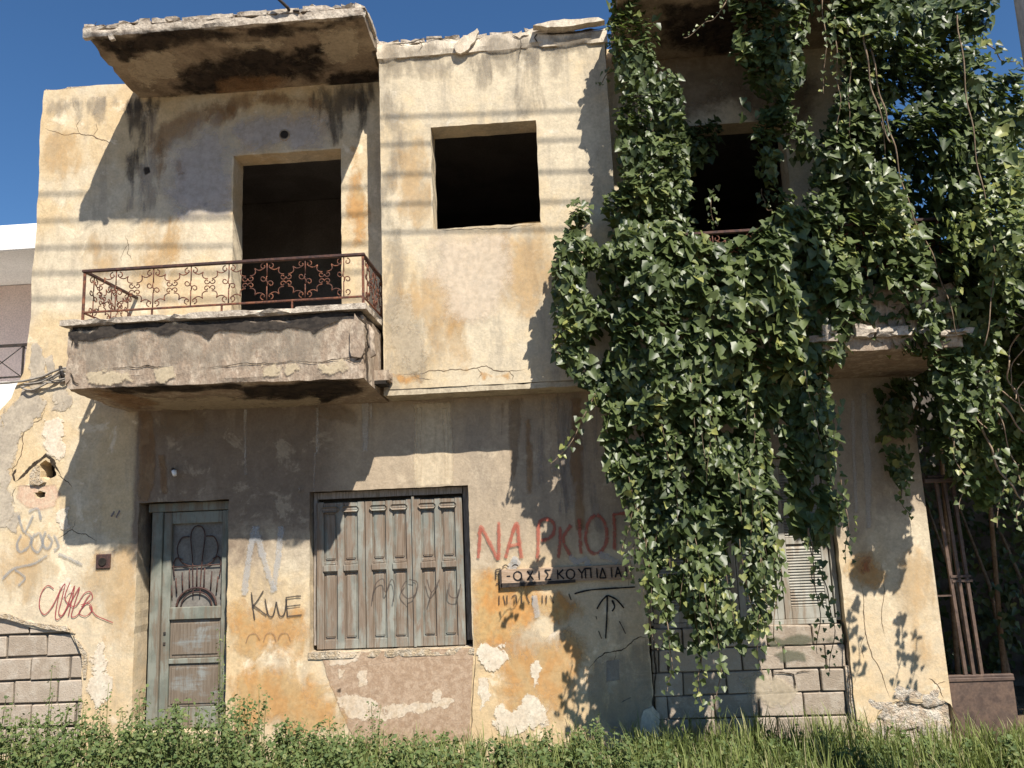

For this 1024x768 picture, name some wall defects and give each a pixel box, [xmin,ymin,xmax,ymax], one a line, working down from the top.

leakage [96,14,379,144]
flaking render [454,29,479,55]
crack [45,120,110,143]
leakage [347,173,366,241]
peeling [86,370,133,386]
spalling [318,313,365,374]
crack [396,365,519,380]
peeling [0,343,73,533]
spalling [0,614,113,762]
peeling [329,626,572,737]
crack [846,564,945,730]
spalling [843,664,952,748]